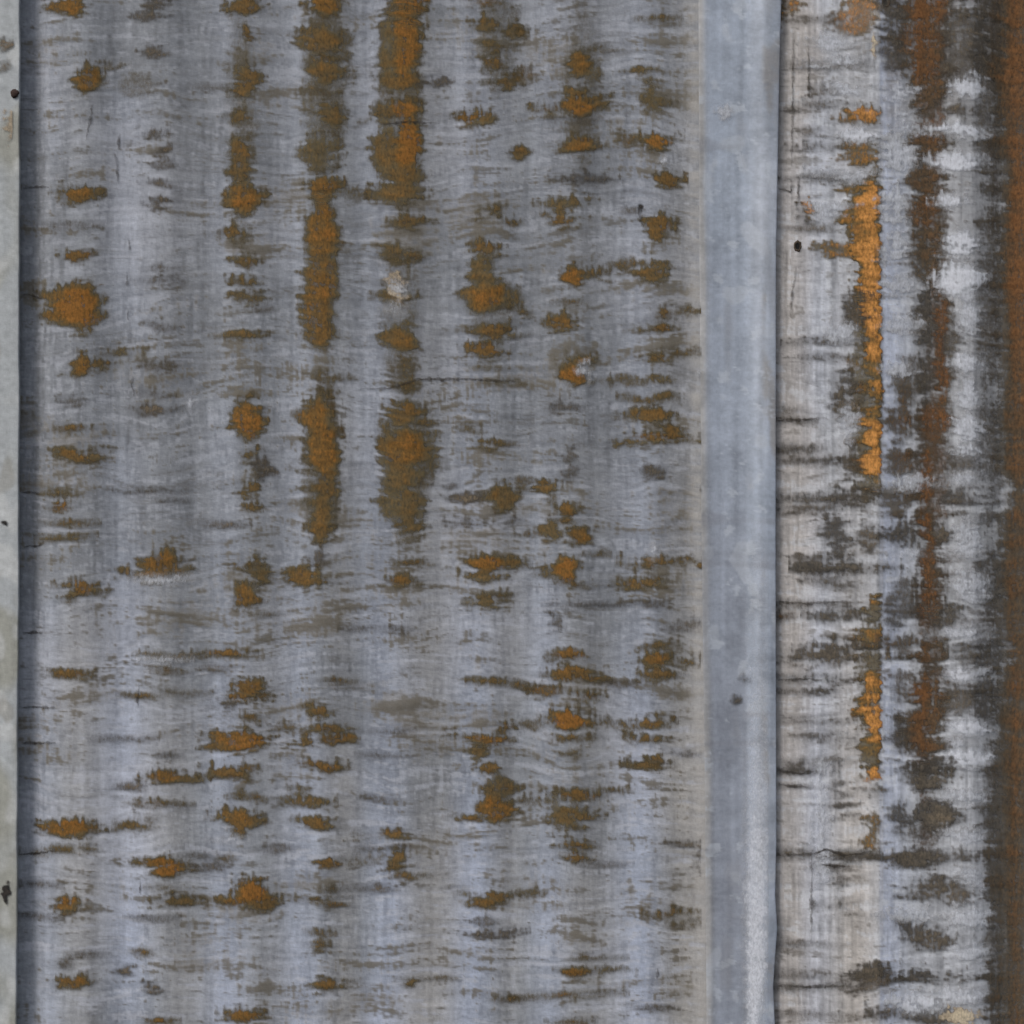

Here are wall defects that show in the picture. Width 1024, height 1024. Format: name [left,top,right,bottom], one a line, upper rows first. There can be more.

rust [291,0,434,351]
rust [32,279,146,378]
rust [293,369,353,547]
rust [369,286,443,543]
rust [455,236,529,368]
rust [457,476,606,610]
rust [808,0,966,803]
rust [982,0,1024,1024]
rust [34,815,152,854]
rust [129,854,346,914]
rust [132,676,359,838]
rust [449,645,679,864]